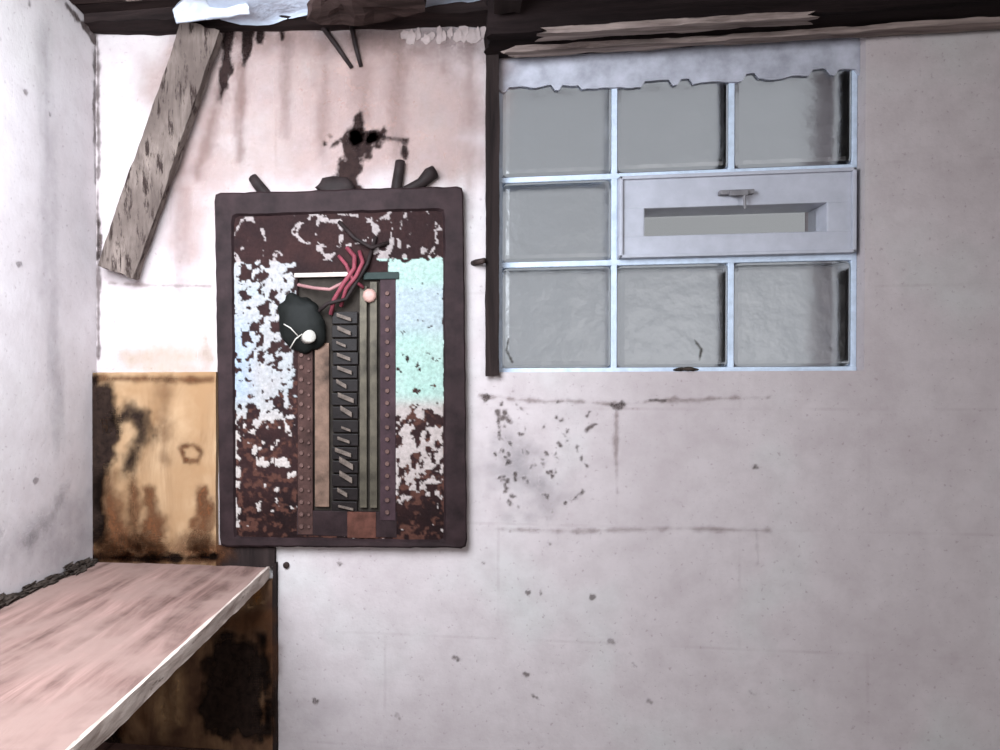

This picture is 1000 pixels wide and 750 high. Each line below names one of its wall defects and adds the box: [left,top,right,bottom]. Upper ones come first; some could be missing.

water stain [214,31,264,98]
water stain [269,31,468,189]
water stain [495,402,510,436]